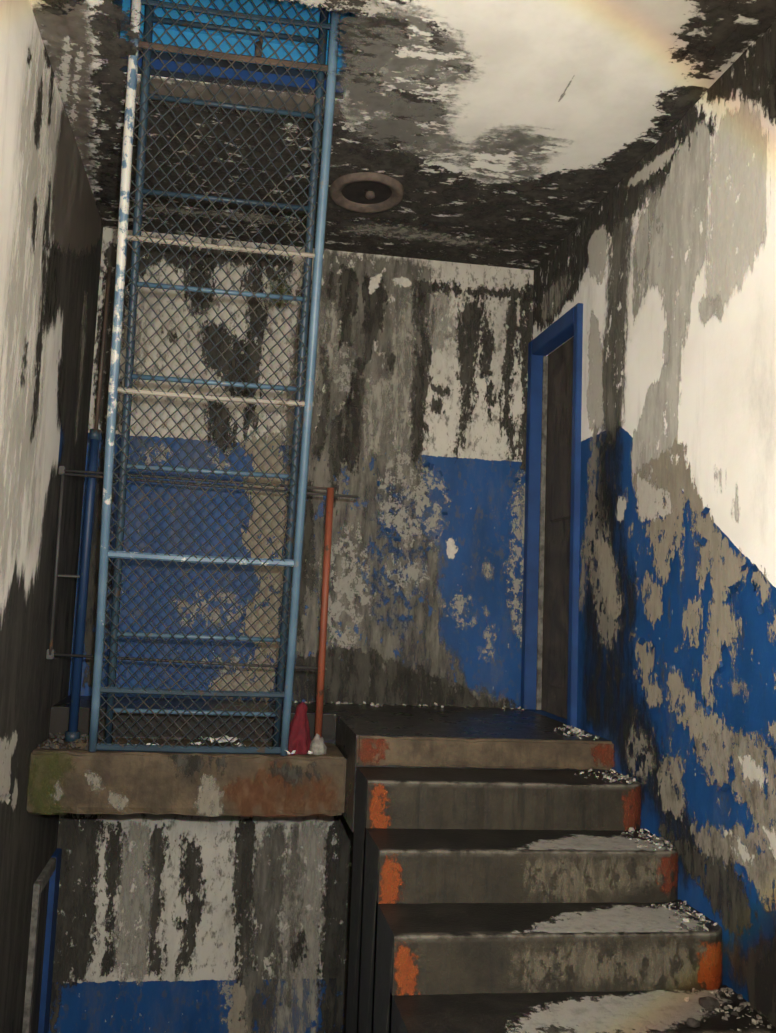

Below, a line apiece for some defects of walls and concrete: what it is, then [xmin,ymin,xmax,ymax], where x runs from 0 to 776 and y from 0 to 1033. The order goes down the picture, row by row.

damp [121,0,776,708]
damp [0,0,207,1033]
peeling [375,450,497,659]
peeling [482,470,526,647]
damp [168,754,227,817]
spalling [579,426,776,990]
peeling [219,975,248,1033]
damp [226,815,354,1033]